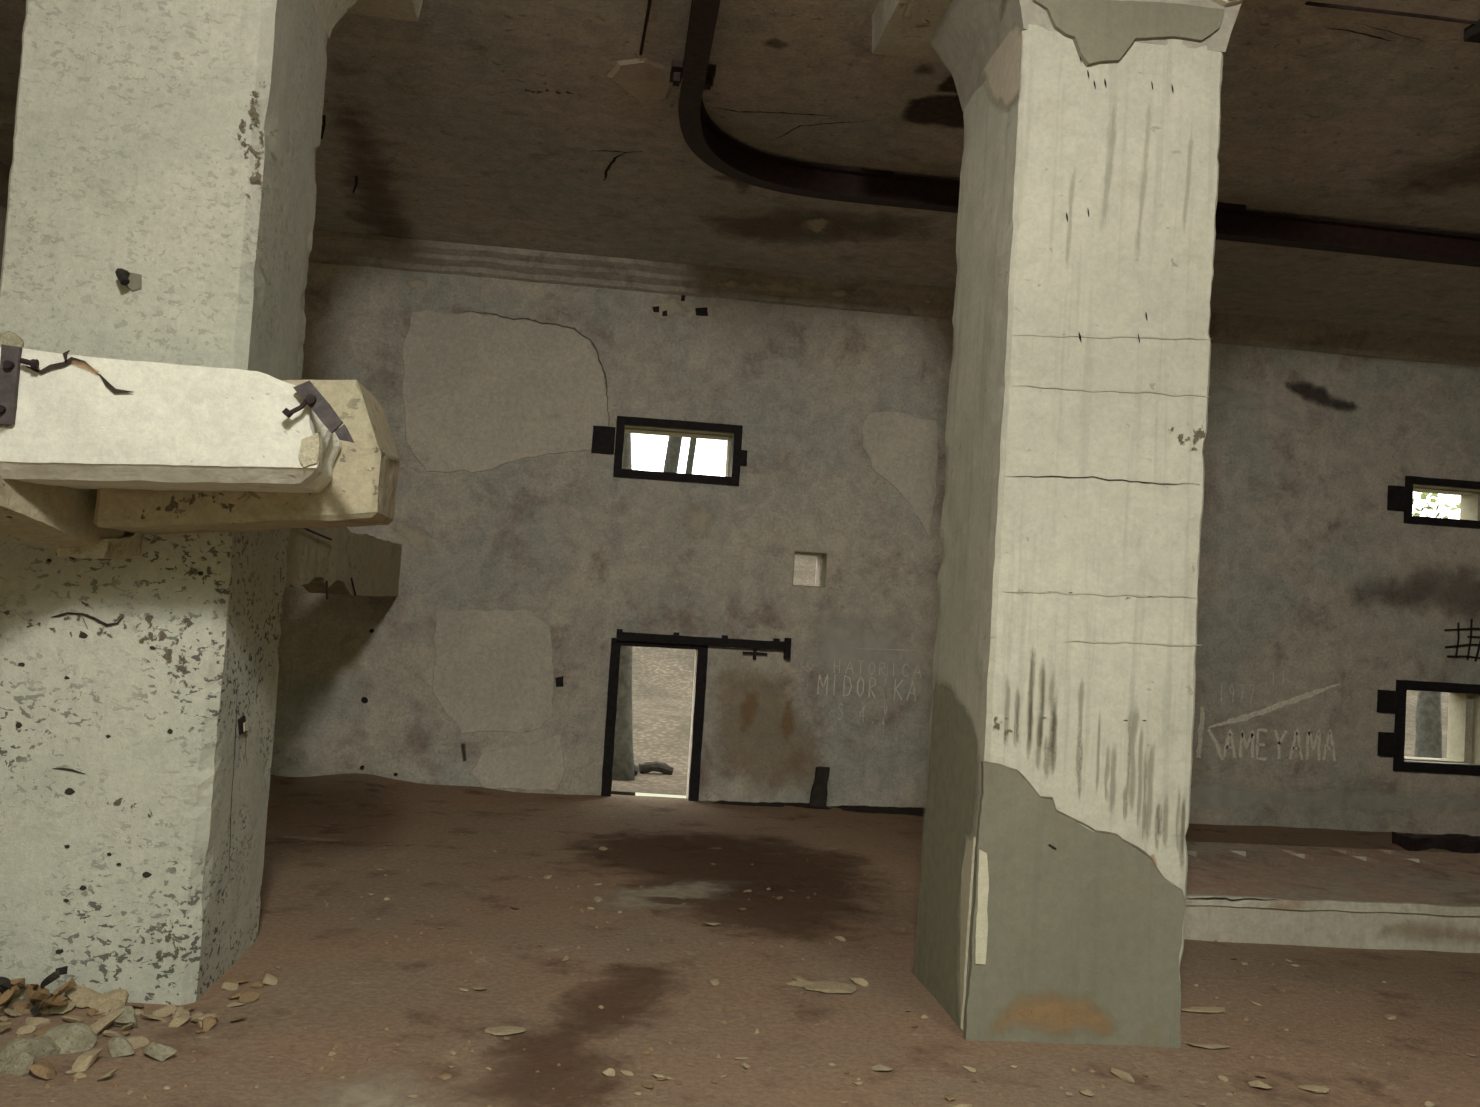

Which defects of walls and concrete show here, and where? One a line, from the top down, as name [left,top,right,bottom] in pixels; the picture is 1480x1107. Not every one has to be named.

spalling [983,28,1023,105]
flaking render [1032,0,1243,67]
spalling [238,81,276,197]
spalling [128,492,235,519]
spalling [299,432,323,468]
crack [1009,476,1200,488]
damp [575,834,863,938]
flaking render [913,683,1186,1048]
damp [494,968,663,1107]